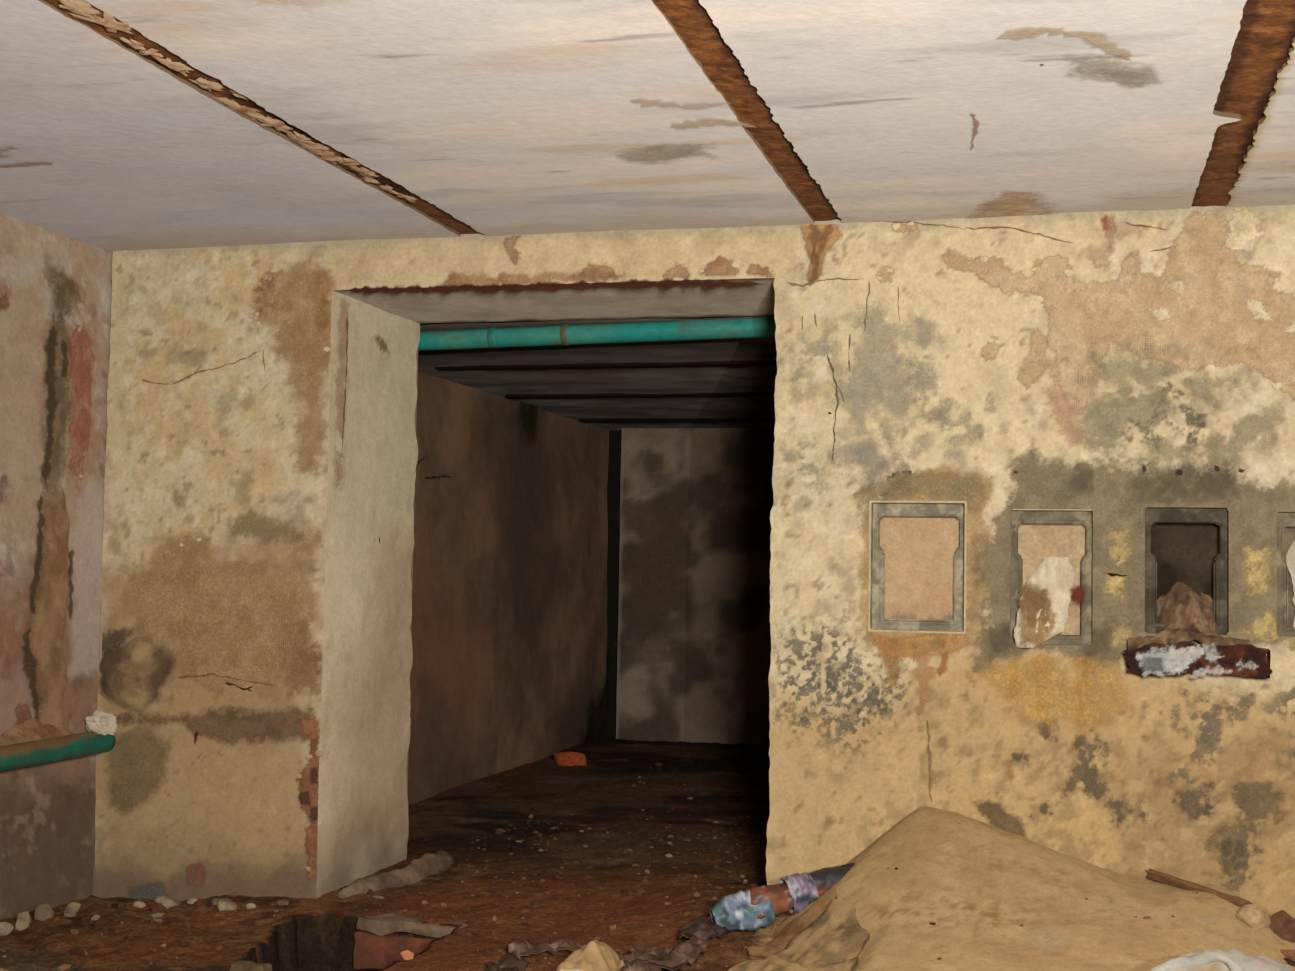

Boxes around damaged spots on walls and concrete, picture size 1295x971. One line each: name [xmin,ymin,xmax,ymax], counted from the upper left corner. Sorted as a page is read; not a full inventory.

crack [143,350,265,385]
rust [43,0,479,234]
peeling [255,264,333,471]
rust [652,0,842,286]
crack [787,278,900,464]
crack [887,221,1072,243]
flaking render [943,209,1295,414]
rust [1191,0,1295,207]
flaking render [296,736,325,879]
water stain [778,628,910,748]
water stain [1065,729,1145,822]
water stain [1171,687,1295,819]